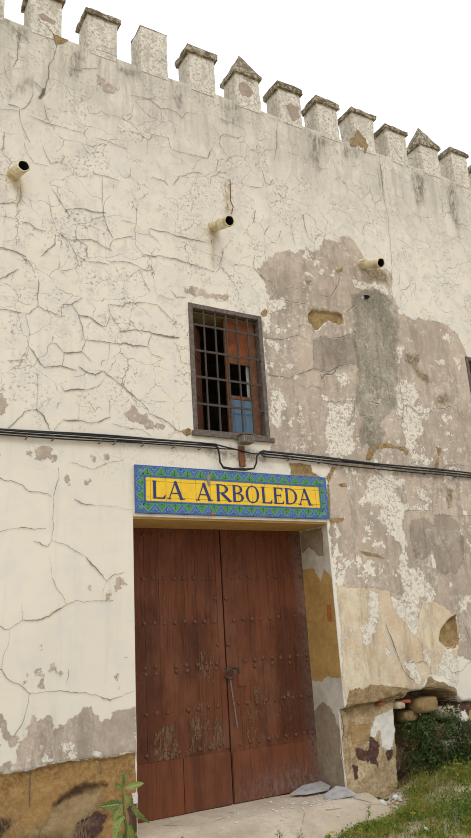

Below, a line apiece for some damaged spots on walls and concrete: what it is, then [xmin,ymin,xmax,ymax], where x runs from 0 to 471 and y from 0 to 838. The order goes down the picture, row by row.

crack [3,19,278,188]
crack [0,173,341,436]
peeling [183,286,229,301]
peeling [26,445,57,463]
crack [0,461,124,630]
peeling [125,406,165,430]
peeling [257,236,471,798]
crack [268,324,471,428]
crack [0,650,134,736]
spalling [0,706,138,838]